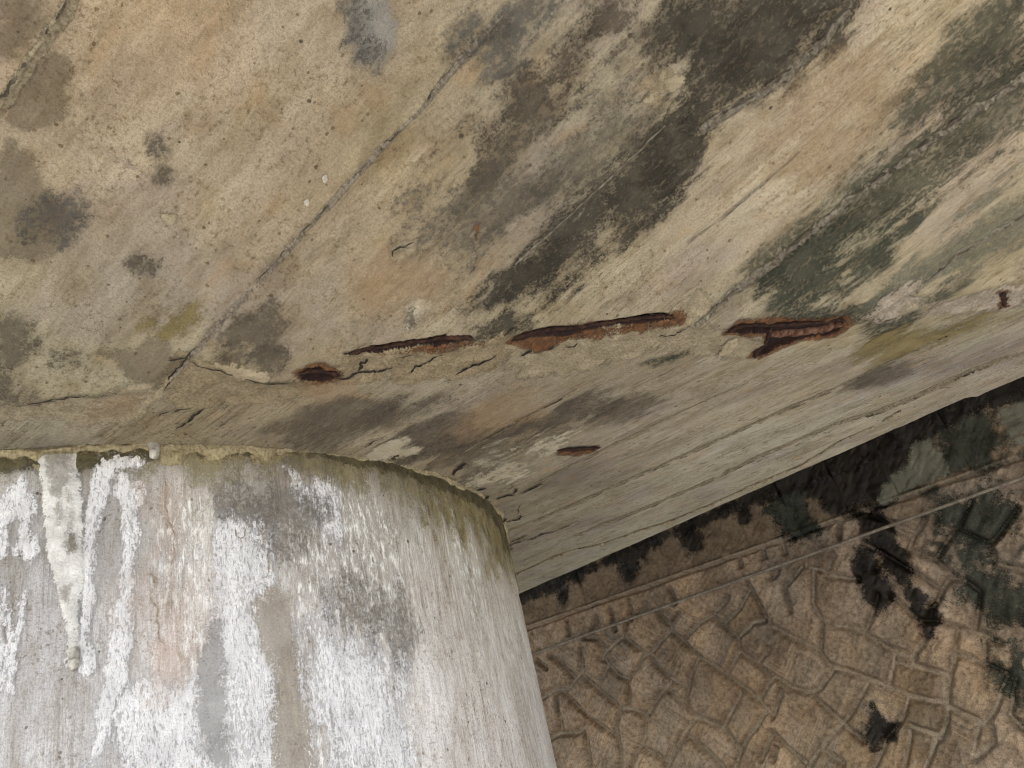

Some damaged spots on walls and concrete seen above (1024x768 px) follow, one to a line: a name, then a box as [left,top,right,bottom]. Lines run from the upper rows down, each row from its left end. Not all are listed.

leakage [16,189,90,251]
leakage [388,0,862,346]
leakage [740,44,1024,295]
crack [158,346,297,431]
spalling [0,277,1024,427]
leakage [0,470,40,564]
leakage [0,585,29,695]